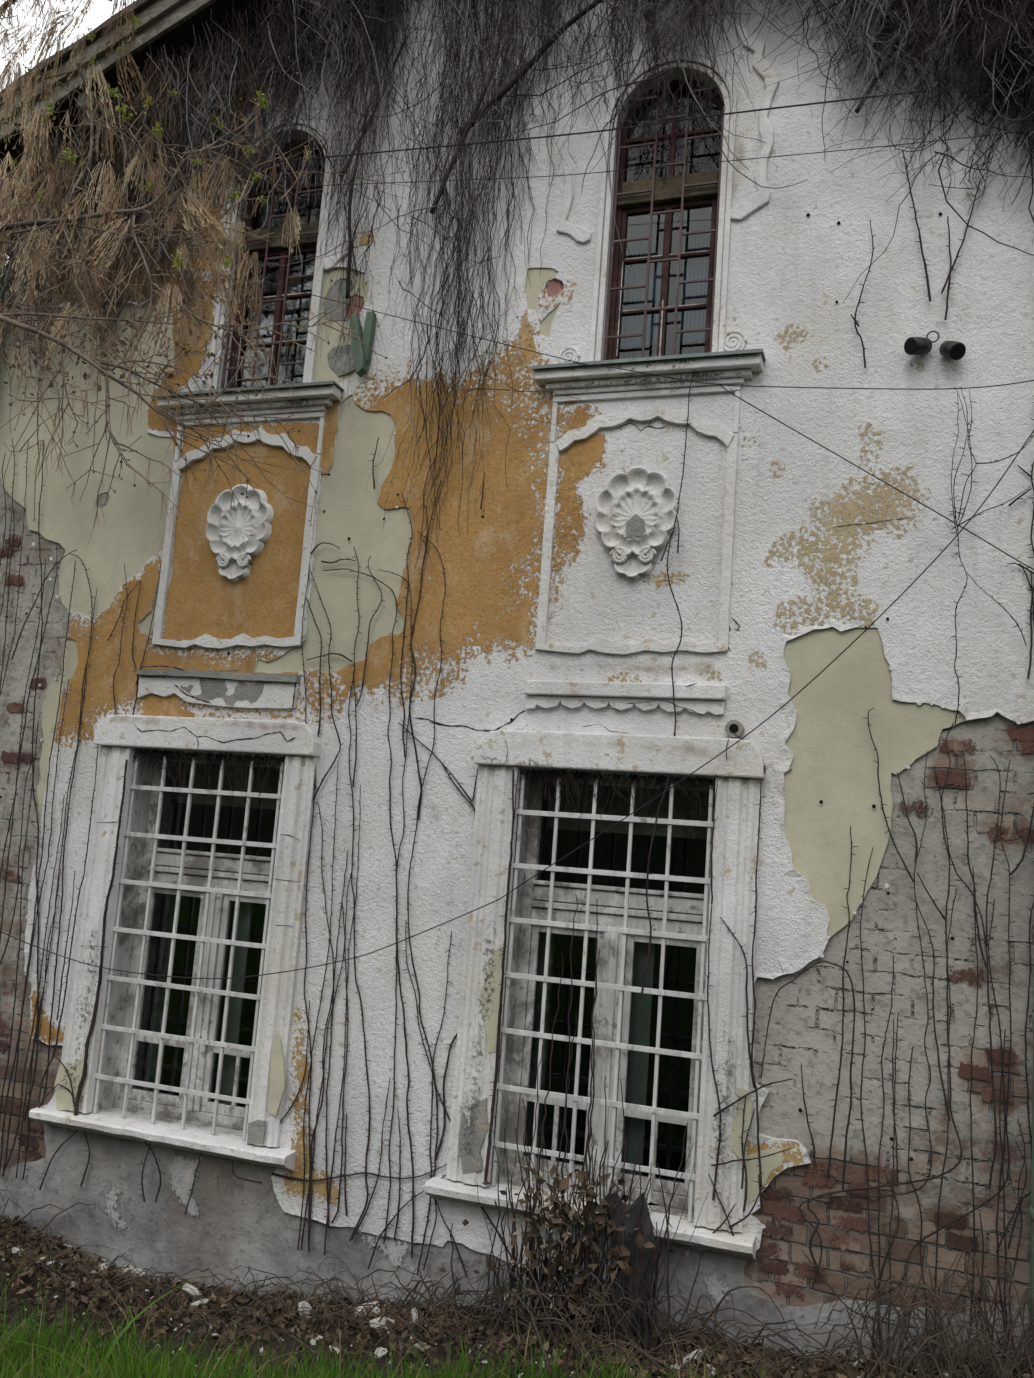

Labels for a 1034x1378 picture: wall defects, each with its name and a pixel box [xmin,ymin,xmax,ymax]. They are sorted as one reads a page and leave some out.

flaking render [0,163,632,1316]
peeling [616,250,708,356]